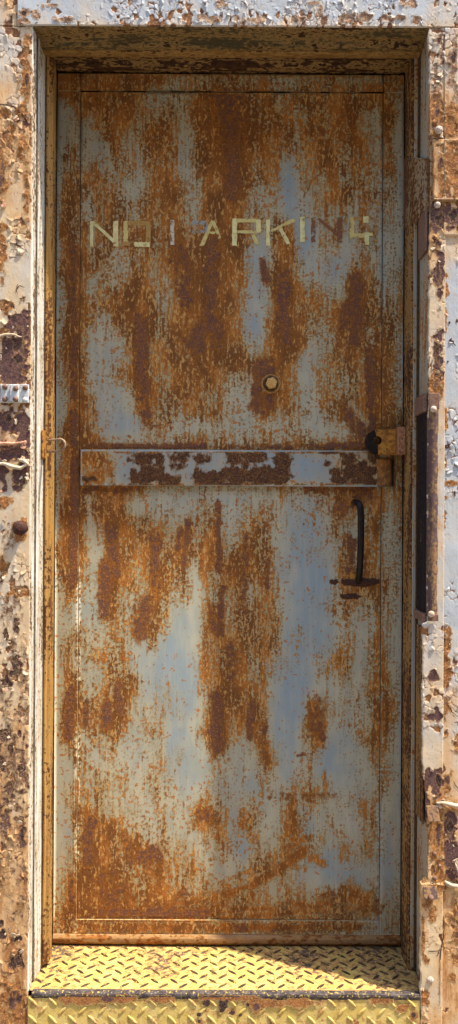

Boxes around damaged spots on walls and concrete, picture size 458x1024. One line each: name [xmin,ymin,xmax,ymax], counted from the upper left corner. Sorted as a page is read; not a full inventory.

peeling [17,0,74,26]
peeling [197,0,265,25]
peeling [338,0,423,26]
peeling [430,33,458,104]
rust [54,73,404,935]
peeling [3,618,20,641]
peeling [0,652,22,692]
rust [0,396,30,938]
peeling [0,728,26,797]
rust [421,767,458,982]
peeling [0,920,25,970]
rust [0,972,28,1024]